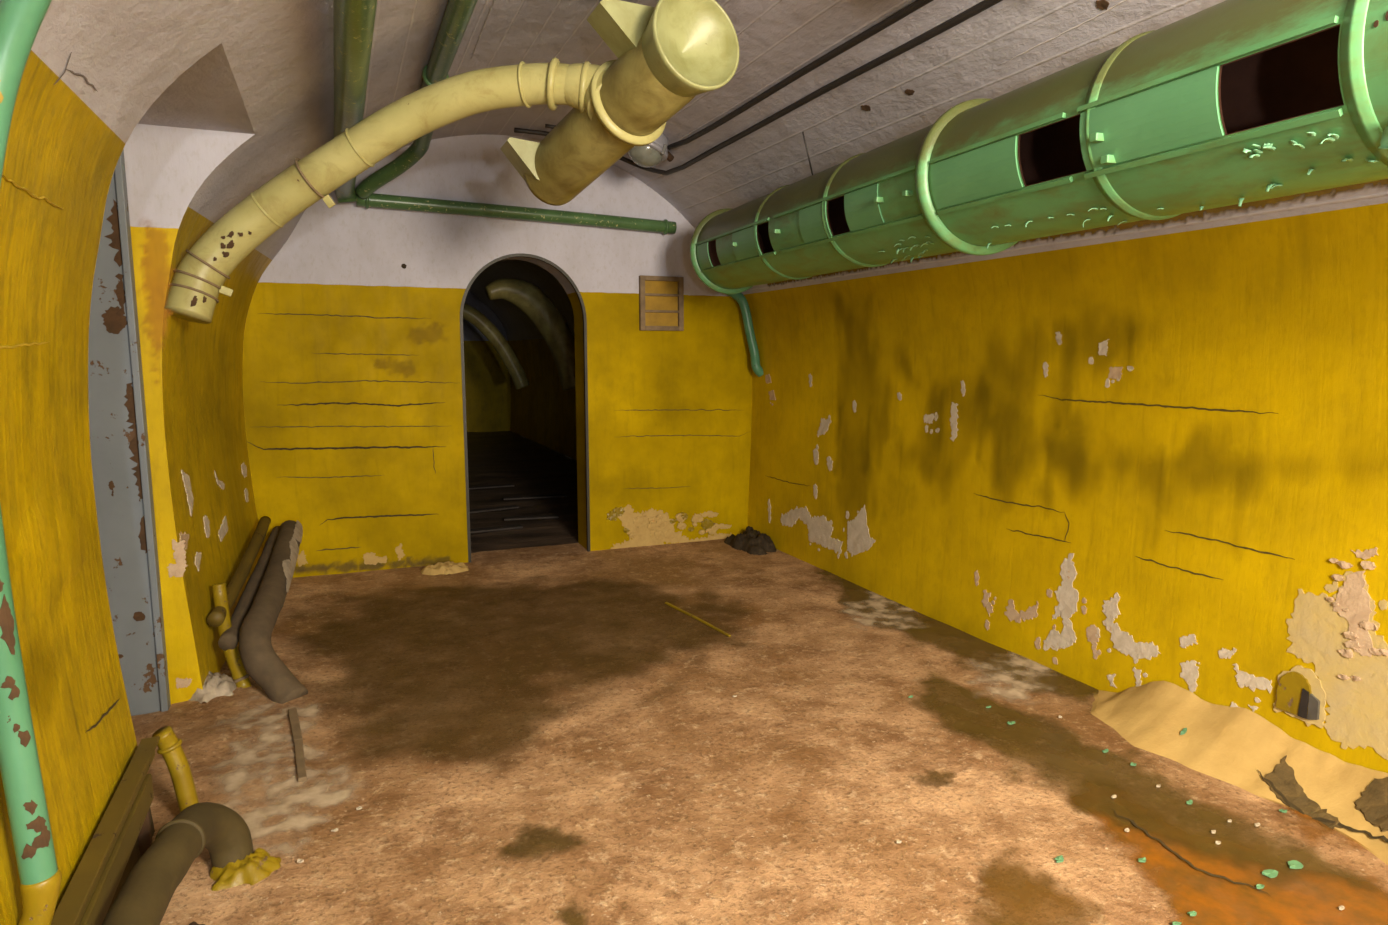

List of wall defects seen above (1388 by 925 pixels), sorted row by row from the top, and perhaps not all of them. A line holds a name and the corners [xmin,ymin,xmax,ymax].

peeling [923,380,966,441]
corrosion [124,382,155,554]
peeling [167,470,228,577]
peeling [607,505,732,549]
peeling [768,484,876,559]
damp [295,560,444,572]
damp [305,581,738,758]
peeling [974,553,1161,687]
peeling [1180,634,1200,693]
peeling [1218,648,1272,712]
peeling [1286,547,1388,760]
spalling [1355,777,1388,832]